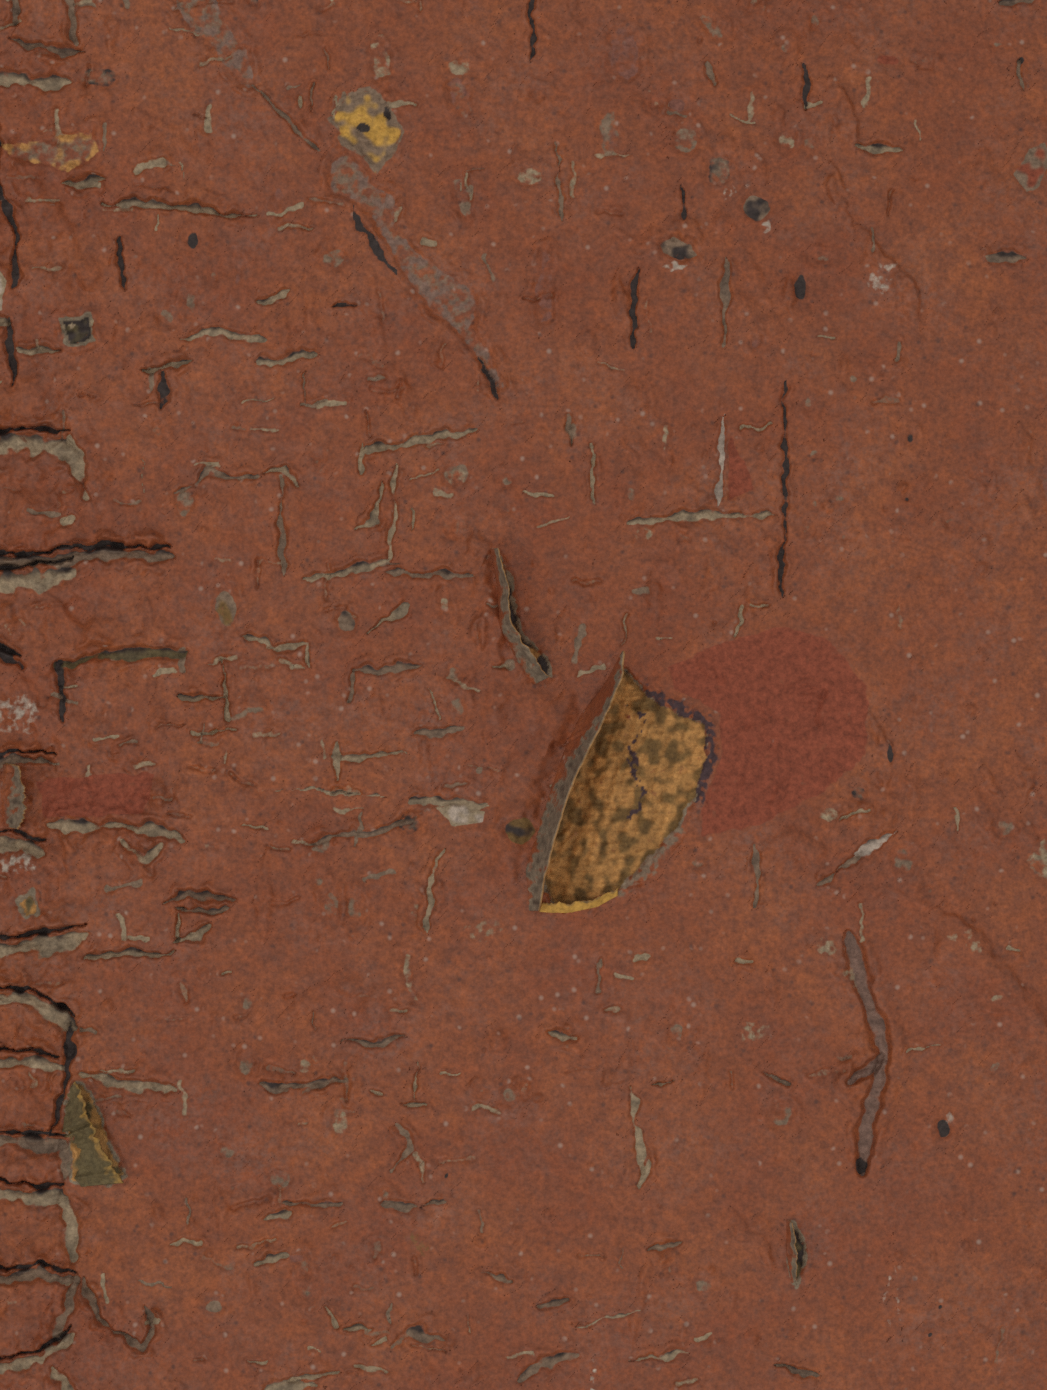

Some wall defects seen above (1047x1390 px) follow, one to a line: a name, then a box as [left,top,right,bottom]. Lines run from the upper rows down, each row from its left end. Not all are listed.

peeling [428,46,493,86]
peeling [317,86,518,410]
peeling [425,651,720,920]
crack [816,830,897,896]
peeling [58,1072,138,1197]
crack [827,929,913,1179]